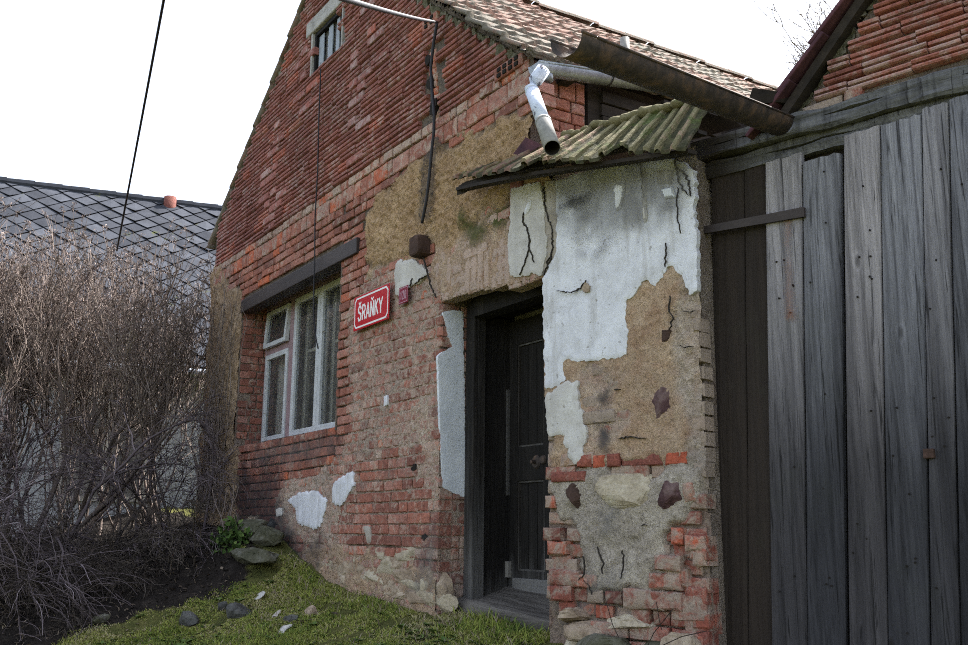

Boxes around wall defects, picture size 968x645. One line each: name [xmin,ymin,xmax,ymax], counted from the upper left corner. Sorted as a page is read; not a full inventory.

flaking render [394,259,429,296]
crack [519,187,554,276]
flaking render [507,158,701,464]
crack [664,158,692,267]